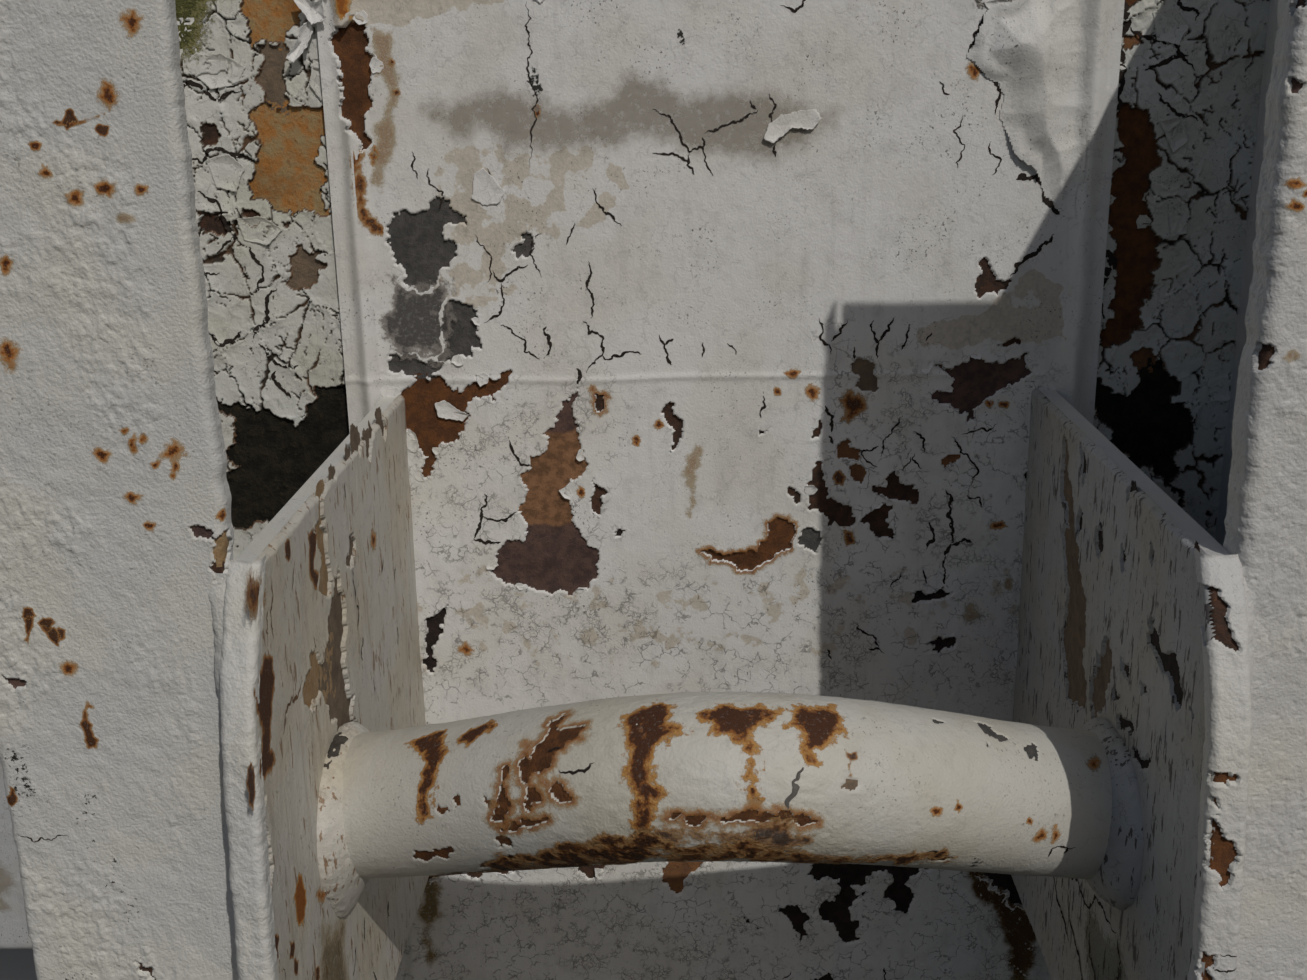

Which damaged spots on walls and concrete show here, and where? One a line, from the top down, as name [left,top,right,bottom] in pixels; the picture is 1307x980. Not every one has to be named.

corrosion [53,80,118,137]
water stain [431,68,805,154]
crack [652,94,777,175]
crack [177,0,346,472]
crack [476,190,737,384]
peeling [1099,104,1163,374]
peeling [486,385,611,595]
peeling [695,439,919,575]
corrosion [246,653,276,811]
corrosion [405,719,498,825]
corrosion [419,702,958,962]
peeling [778,851,951,943]